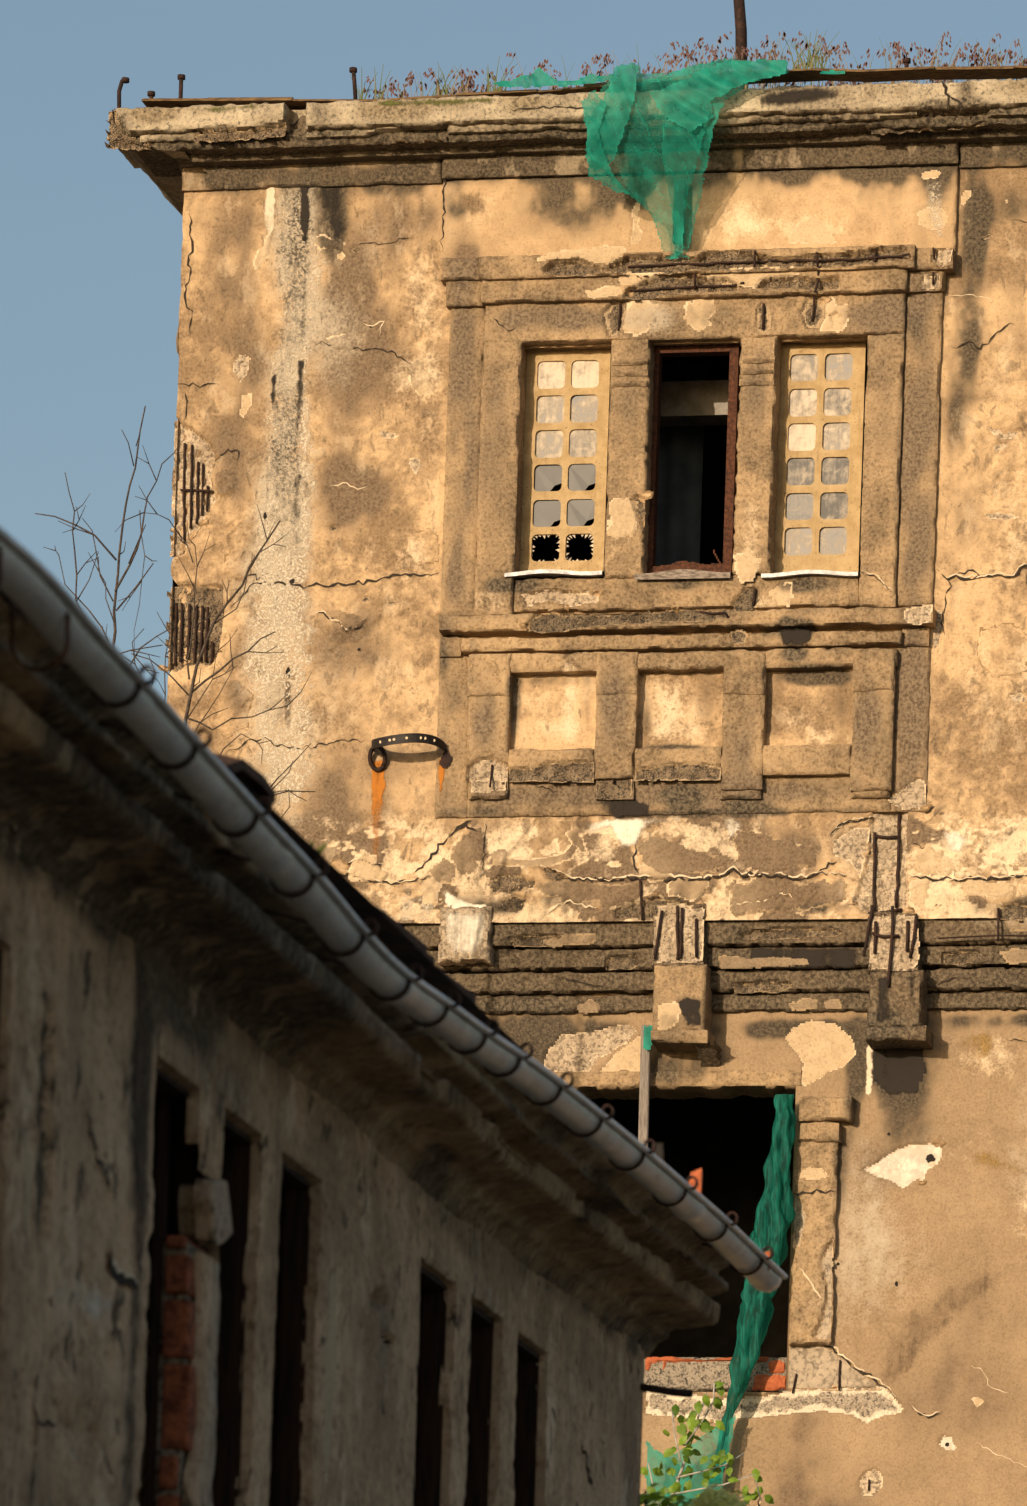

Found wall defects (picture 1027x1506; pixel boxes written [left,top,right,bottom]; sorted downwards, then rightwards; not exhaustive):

spalling [537,202,910,337]
crack [314,321,410,364]
damp [244,187,326,803]
flaking render [607,491,654,539]
crack [938,563,1027,635]
corrosion [371,760,386,825]
spalling [466,759,721,800]
flaking render [420,826,589,913]
spalling [605,772,1027,1086]
spalling [544,999,681,1072]
spalling [864,1138,947,1188]
crack [824,1345,939,1418]